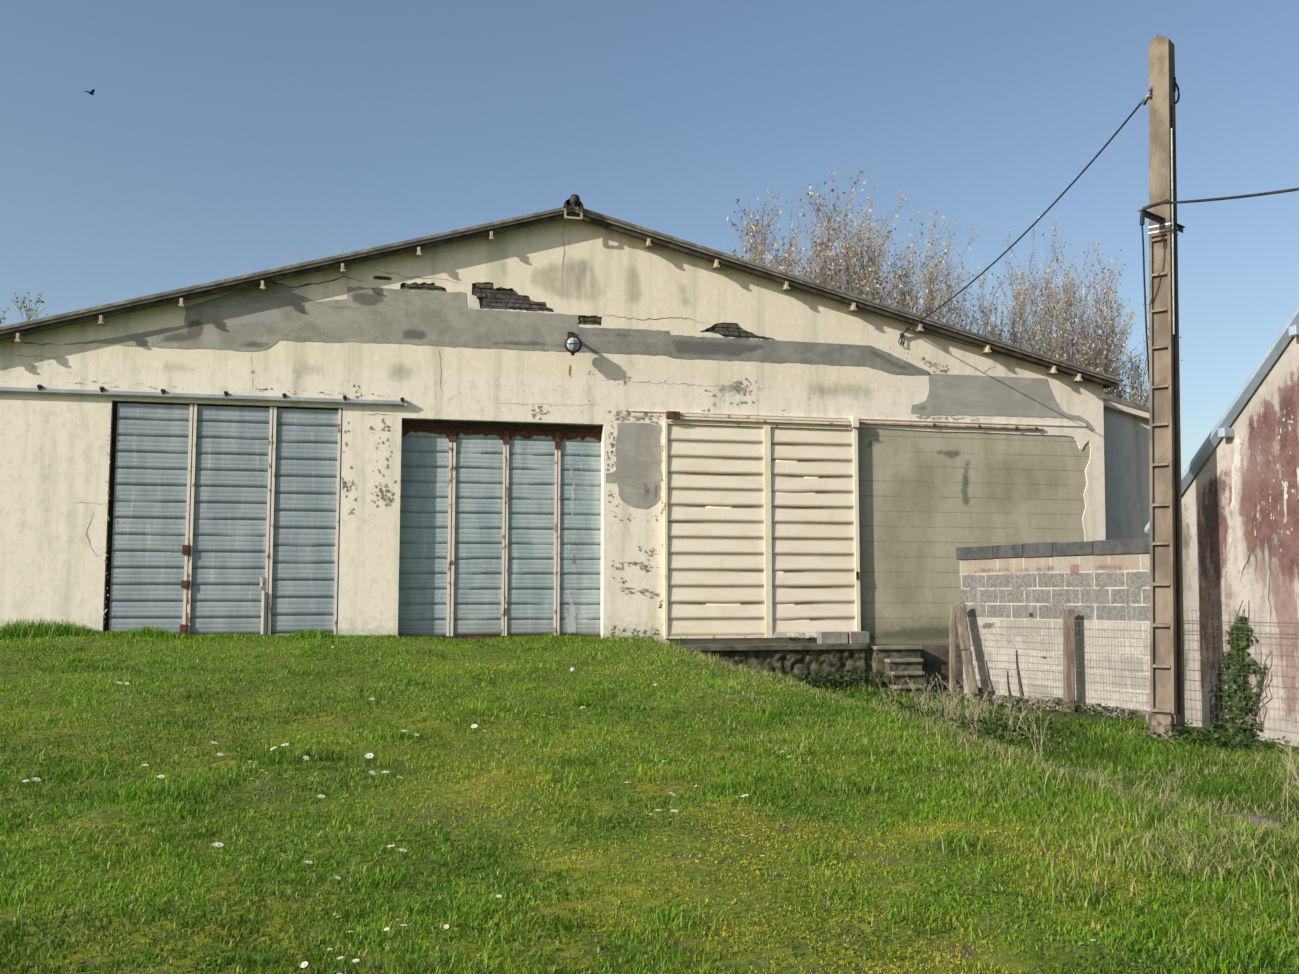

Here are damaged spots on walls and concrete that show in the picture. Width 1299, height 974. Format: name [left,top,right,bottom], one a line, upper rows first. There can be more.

spalling [374,276,447,292]
spalling [701,323,774,340]
peeling [341,418,397,515]
corrosion [403,426,601,450]
peeling [1198,373,1299,715]
peeling [611,545,663,608]